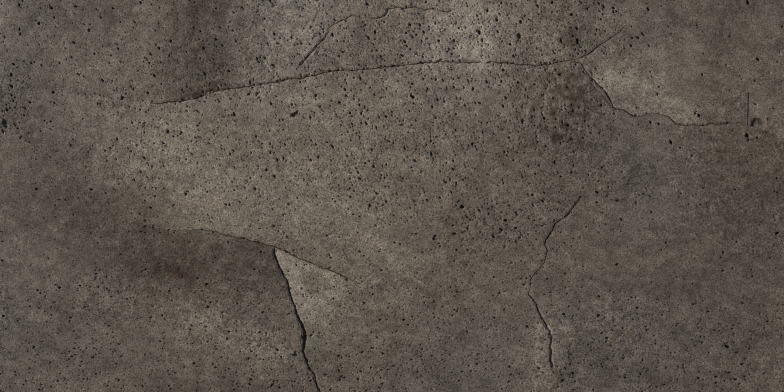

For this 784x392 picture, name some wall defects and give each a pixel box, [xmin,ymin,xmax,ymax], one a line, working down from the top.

crack [151,6,742,127]
crack [145,225,363,392]
crack [527,194,584,368]